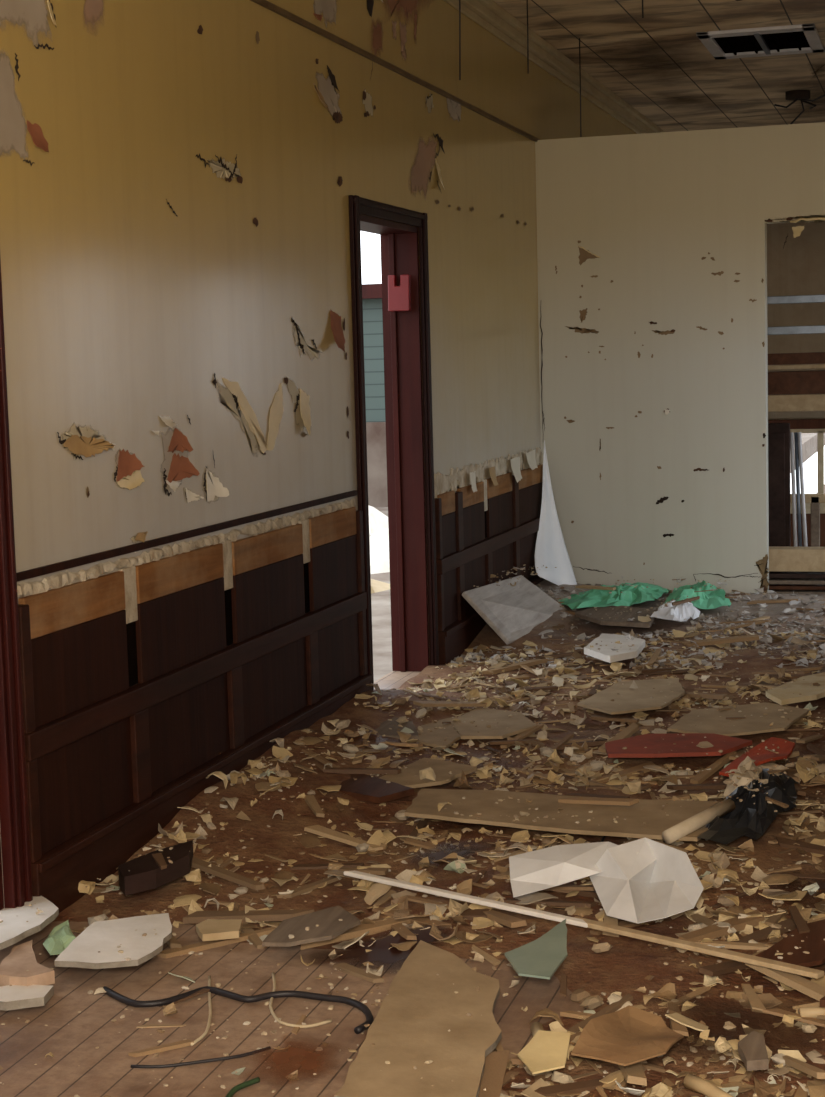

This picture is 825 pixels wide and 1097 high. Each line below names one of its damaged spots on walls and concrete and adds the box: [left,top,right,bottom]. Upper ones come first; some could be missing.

peeling [0,0,57,50]
peeling [0,52,49,166]
peeling [313,58,343,123]
flaking render [765,215,825,248]
peeling [291,318,320,361]
peeling [330,310,347,360]
peeling [212,373,312,455]
peeling [57,422,145,490]
peeling [152,415,229,503]
peeling [445,471,477,492]
peeling [489,450,538,486]